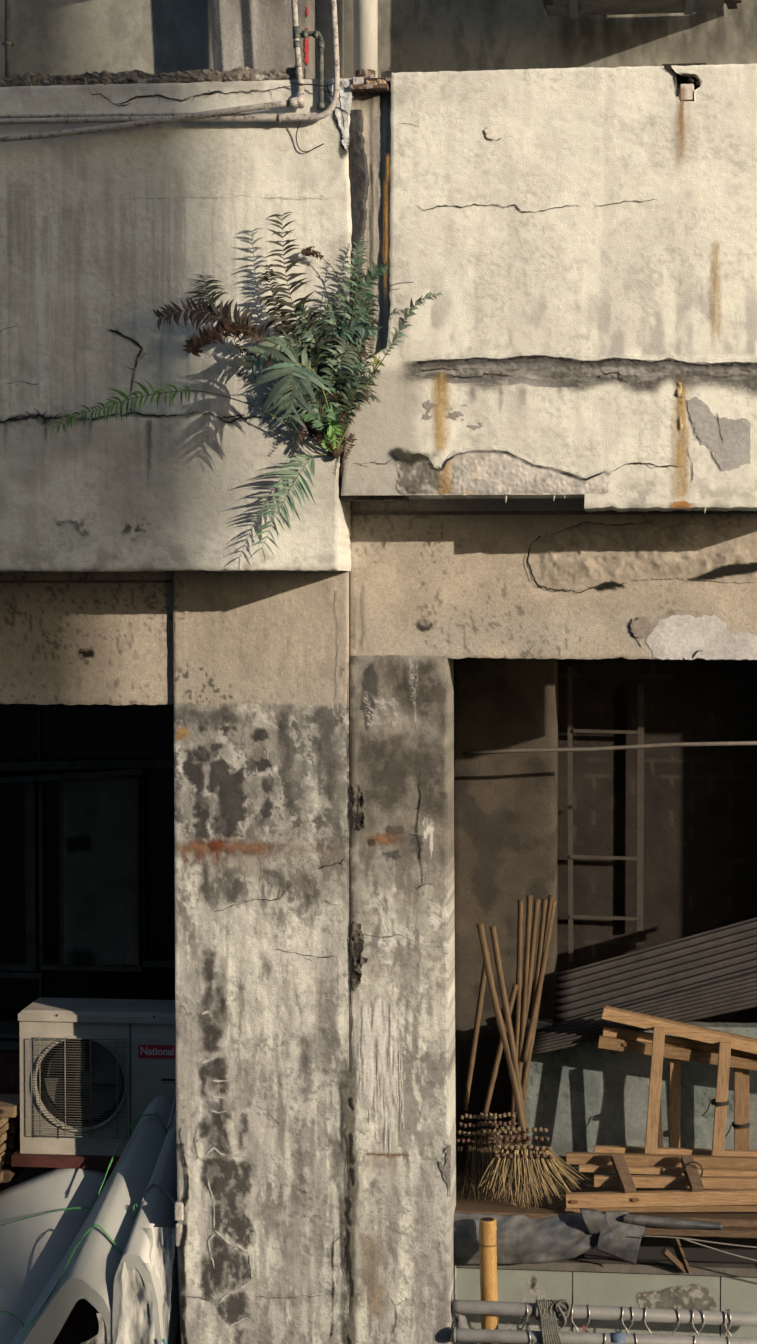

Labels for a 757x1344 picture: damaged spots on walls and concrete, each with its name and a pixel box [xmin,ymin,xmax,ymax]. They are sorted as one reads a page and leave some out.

crack [421,199,657,213]
crack [0,328,272,425]
rust [434,369,447,450]
spalling [392,445,611,495]
spalling [402,351,757,482]
rust [672,378,691,508]
peeling [629,609,757,660]
leakage [203,865,243,901]
rust [176,840,273,858]
leakage [265,870,287,892]
leakage [197,952,254,1339]
leakage [293,1129,306,1207]